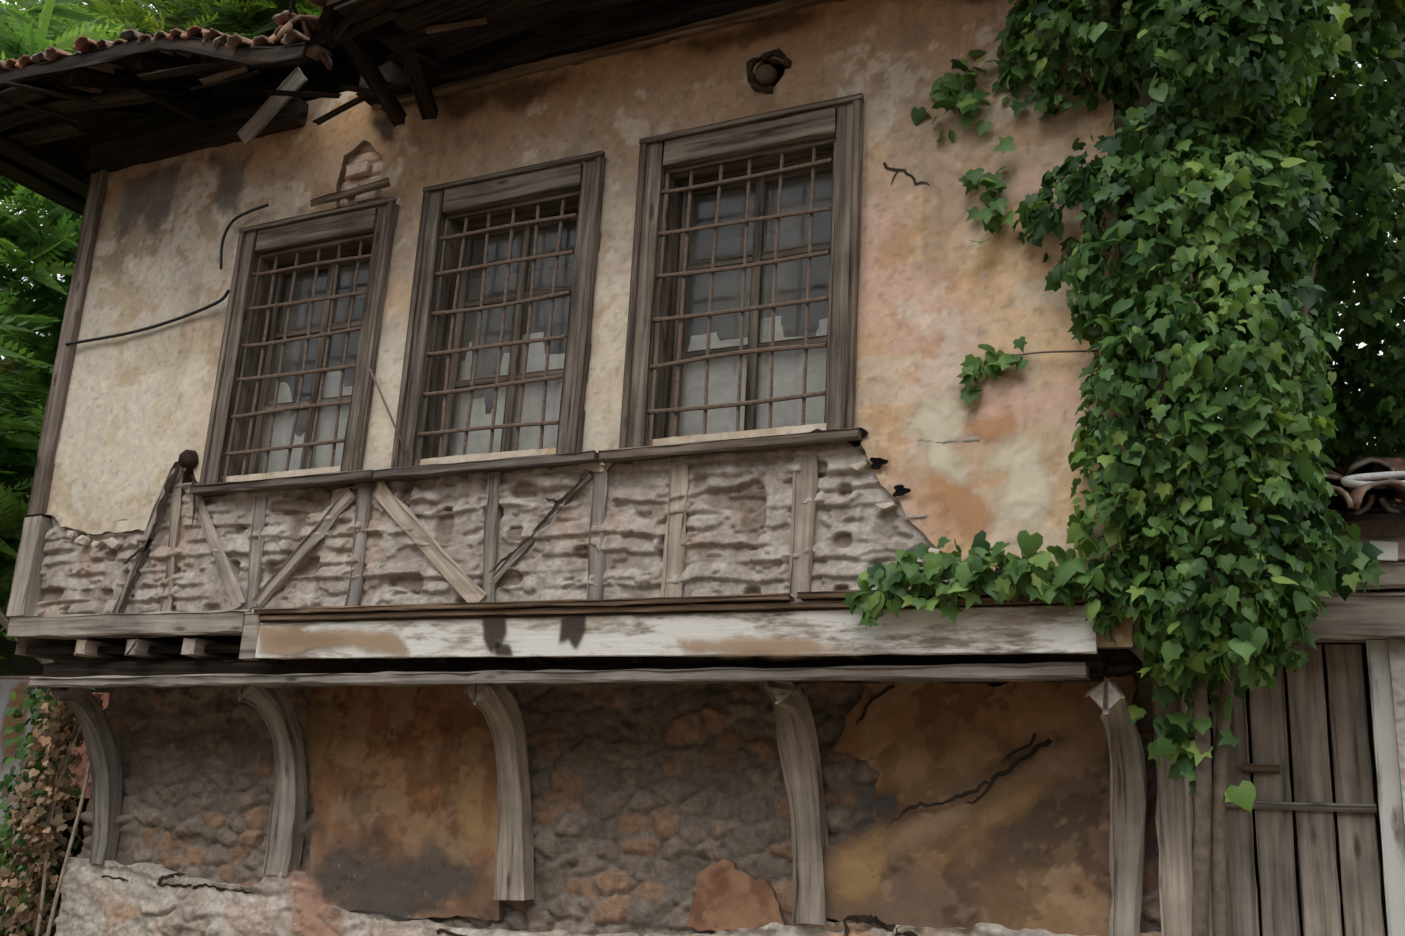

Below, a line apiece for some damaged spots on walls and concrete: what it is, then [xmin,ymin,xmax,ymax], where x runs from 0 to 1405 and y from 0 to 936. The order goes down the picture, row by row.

spalling [34,428,942,616]
peeling [903,391,1052,535]
crack [886,733,1052,829]
spalling [687,858,787,932]